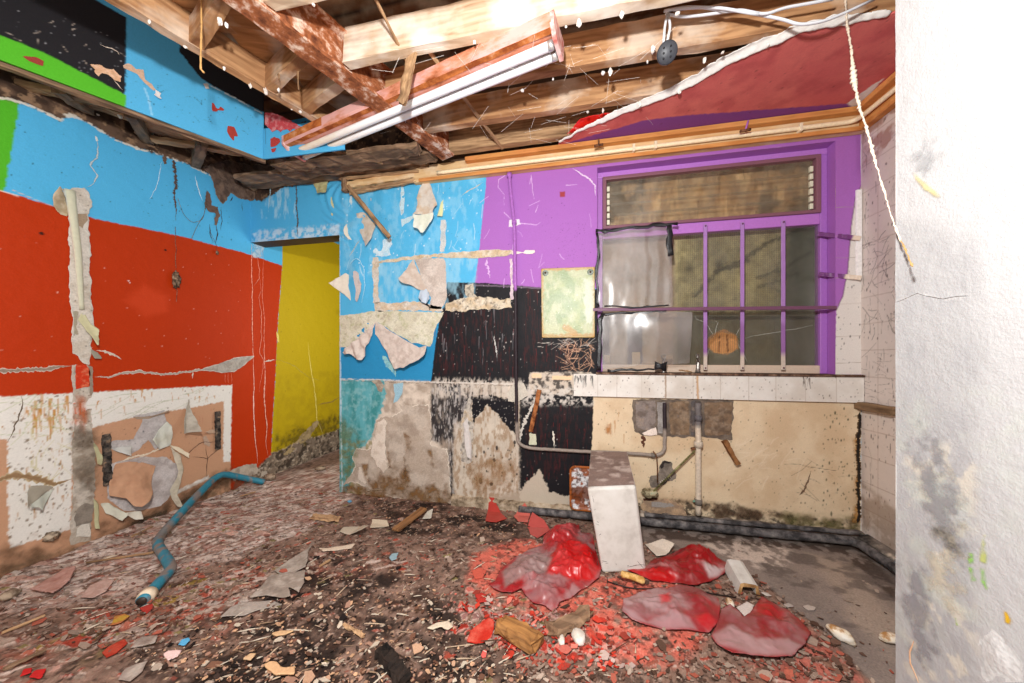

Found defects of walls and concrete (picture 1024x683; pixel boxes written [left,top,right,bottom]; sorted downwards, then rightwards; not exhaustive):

peeling [90,63,162,99]
spalling [204,112,300,225]
flaking render [343,186,535,312]
crack [0,365,69,442]
flaking render [69,365,96,545]
spalling [343,356,474,504]
peeling [507,382,529,402]
damp [713,505,794,525]